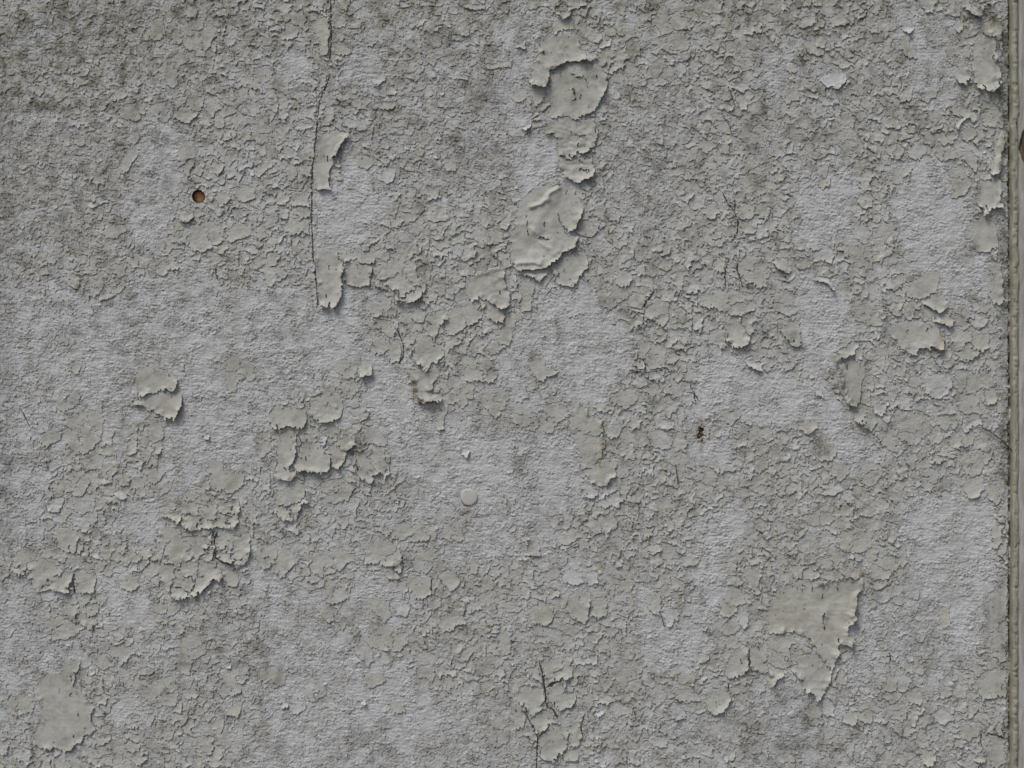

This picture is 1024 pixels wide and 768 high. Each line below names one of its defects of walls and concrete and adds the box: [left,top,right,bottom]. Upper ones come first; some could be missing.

crack [311,0,332,305]
crack [524,662,585,768]